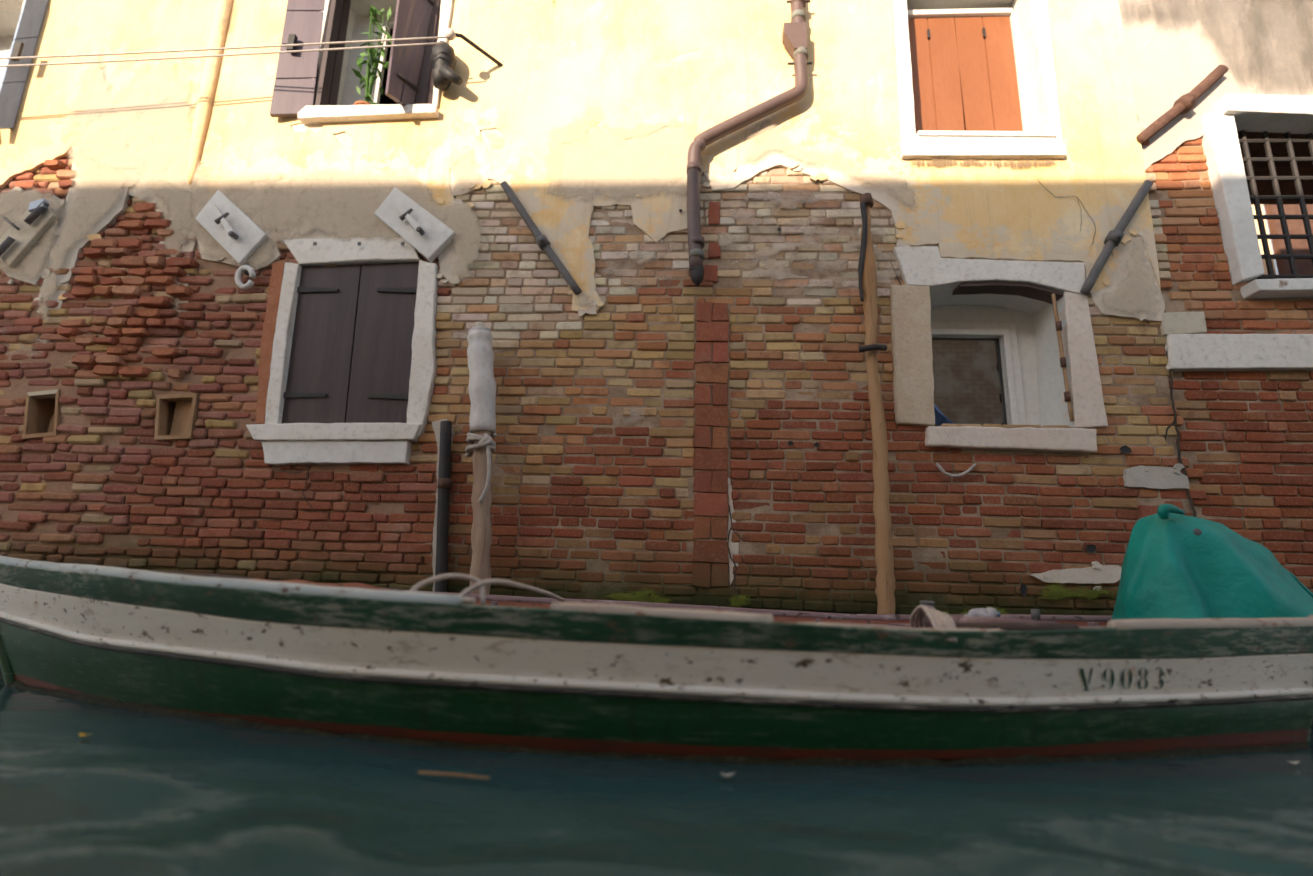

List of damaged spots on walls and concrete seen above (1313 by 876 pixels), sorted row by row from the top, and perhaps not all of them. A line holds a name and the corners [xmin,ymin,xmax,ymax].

damp [1159,0,1313,84]
peeling [0,56,492,319]
peeling [547,116,914,247]
crack [1038,180,1096,244]
peeling [568,285,604,317]
peeling [1090,229,1165,322]
crack [727,502,750,595]